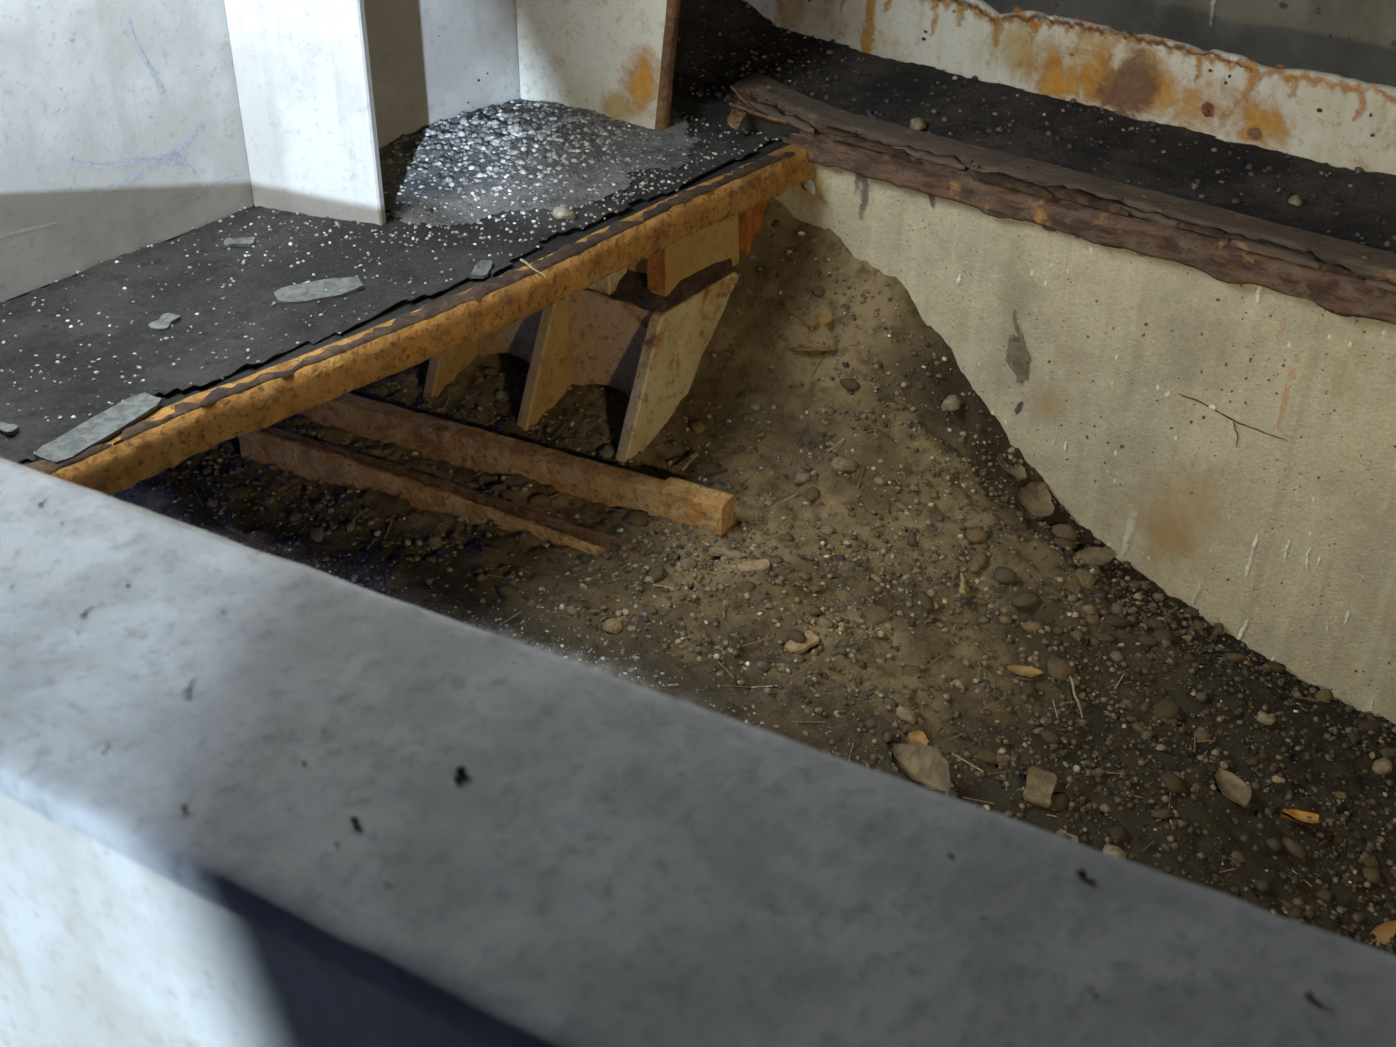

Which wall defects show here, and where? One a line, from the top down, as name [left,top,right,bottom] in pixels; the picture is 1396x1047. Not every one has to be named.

corrosion [606,50,654,118]
corrosion [860,0,891,53]
corrosion [922,0,1396,143]
corrosion [727,85,1396,292]